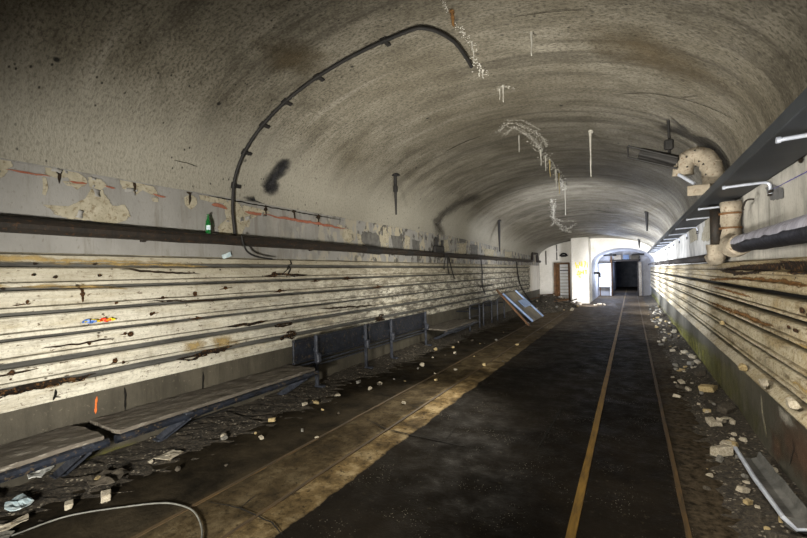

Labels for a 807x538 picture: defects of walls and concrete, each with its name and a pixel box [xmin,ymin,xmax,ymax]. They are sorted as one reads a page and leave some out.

damp [455,23,489,78]
peeling [42,167,131,224]
damp [496,120,573,233]
peeling [337,225,420,251]
corrosion [710,270,807,298]
corrosion [710,303,772,326]